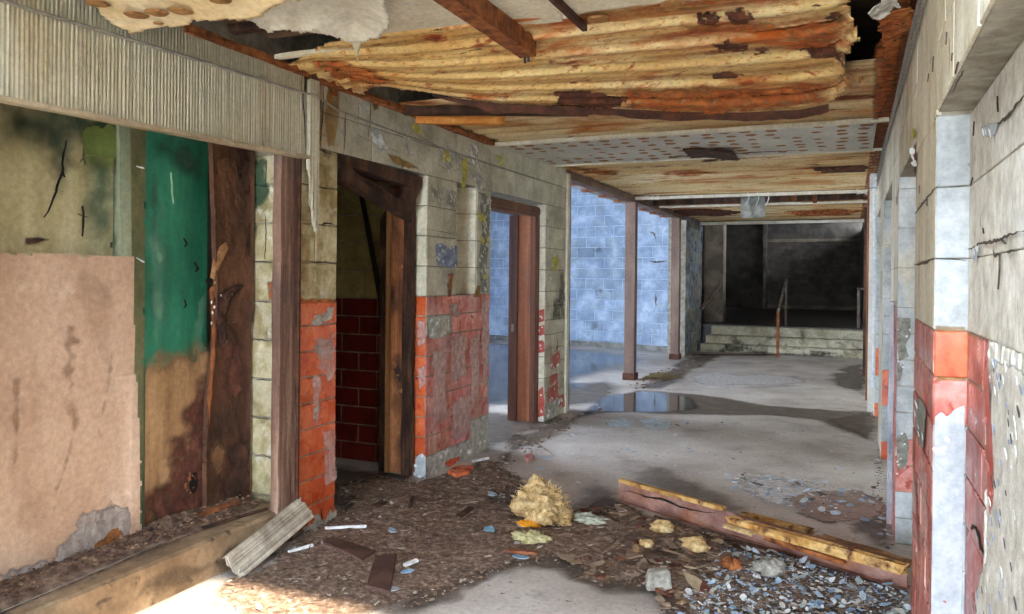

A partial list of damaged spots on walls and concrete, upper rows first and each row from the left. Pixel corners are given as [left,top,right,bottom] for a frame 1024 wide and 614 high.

corrosion [678,0,847,62]
corrosion [314,60,390,97]
corrosion [555,71,831,115]
crack [44,141,86,217]
crack [914,231,1024,289]
spalling [312,307,334,326]
spalling [428,317,450,339]
flaking render [538,309,565,420]
spalling [413,424,489,478]
spalling [895,398,950,479]